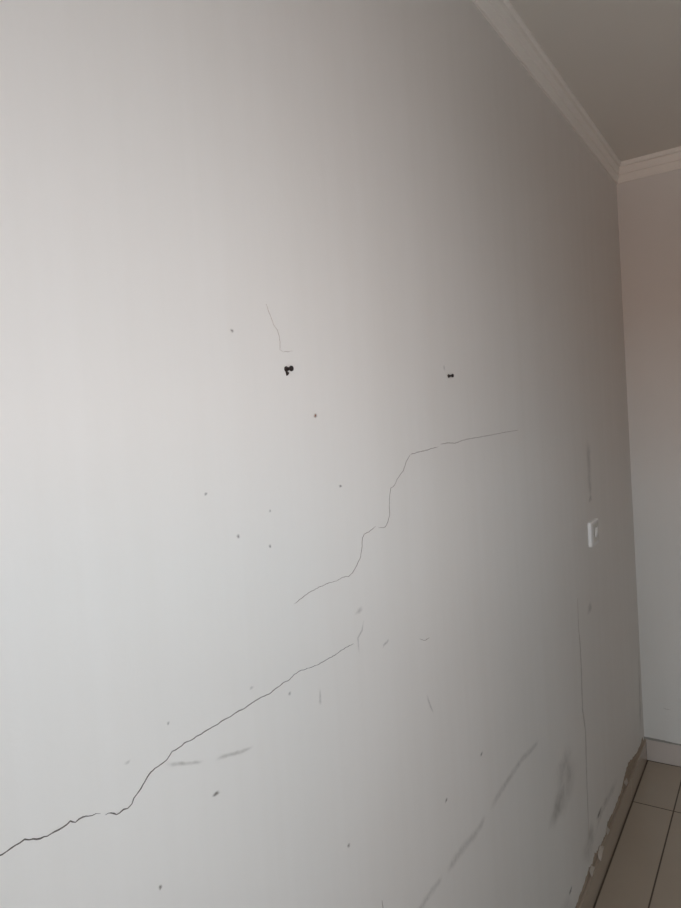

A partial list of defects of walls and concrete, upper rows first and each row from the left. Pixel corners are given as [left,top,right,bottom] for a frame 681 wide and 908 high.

crack [296,430,516,603]
crack [0,645,350,856]
peeling [575,738,643,908]